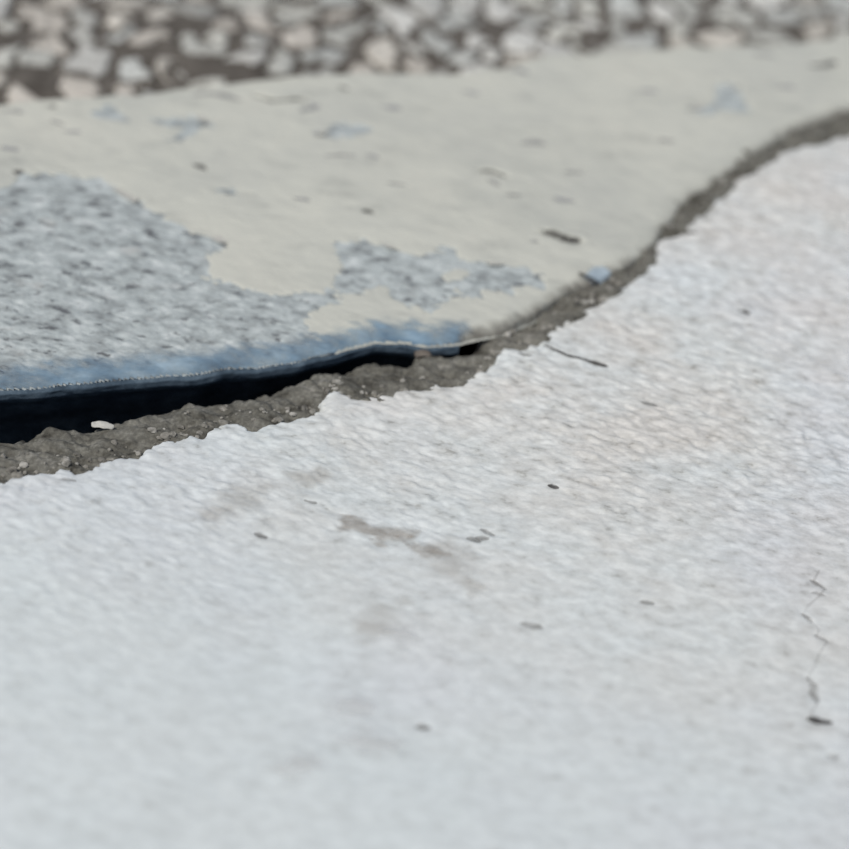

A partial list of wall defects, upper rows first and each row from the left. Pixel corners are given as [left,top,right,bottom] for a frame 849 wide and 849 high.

peeling [0,170,546,391]
crack [0,110,849,484]
crack [807,716,832,724]